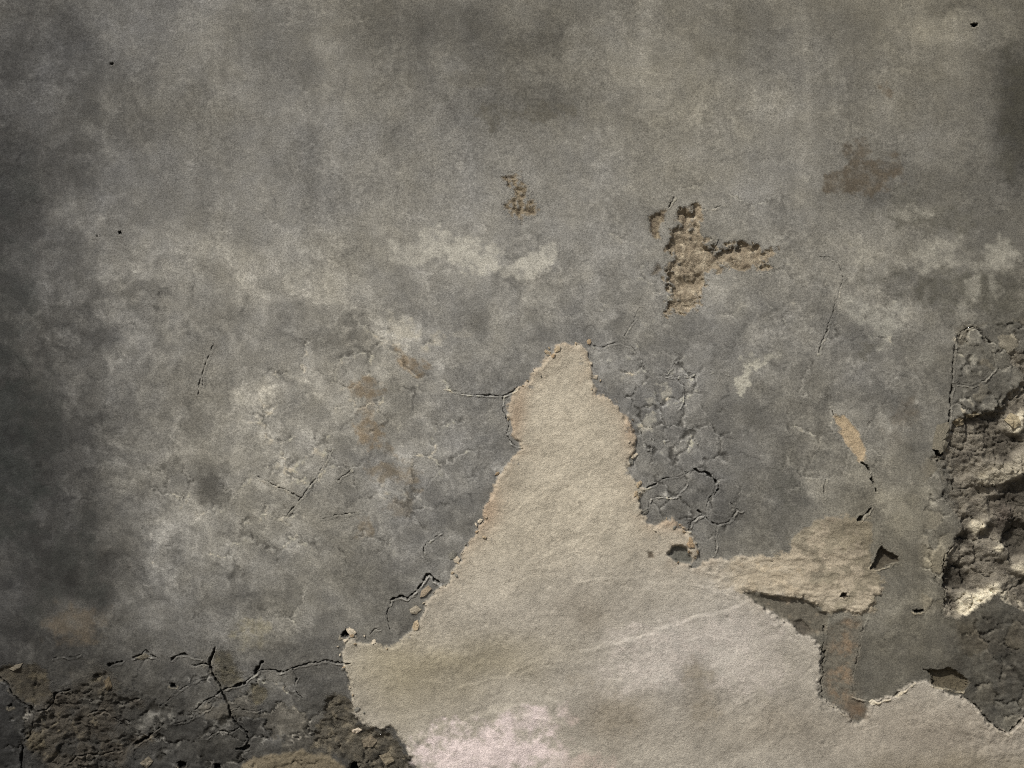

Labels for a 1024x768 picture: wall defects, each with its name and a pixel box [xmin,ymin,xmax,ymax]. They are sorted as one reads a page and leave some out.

crack [0,305,523,768]
flaking render [0,339,1024,768]
spalling [499,168,542,225]
spalling [647,198,781,320]
crack [560,151,999,559]